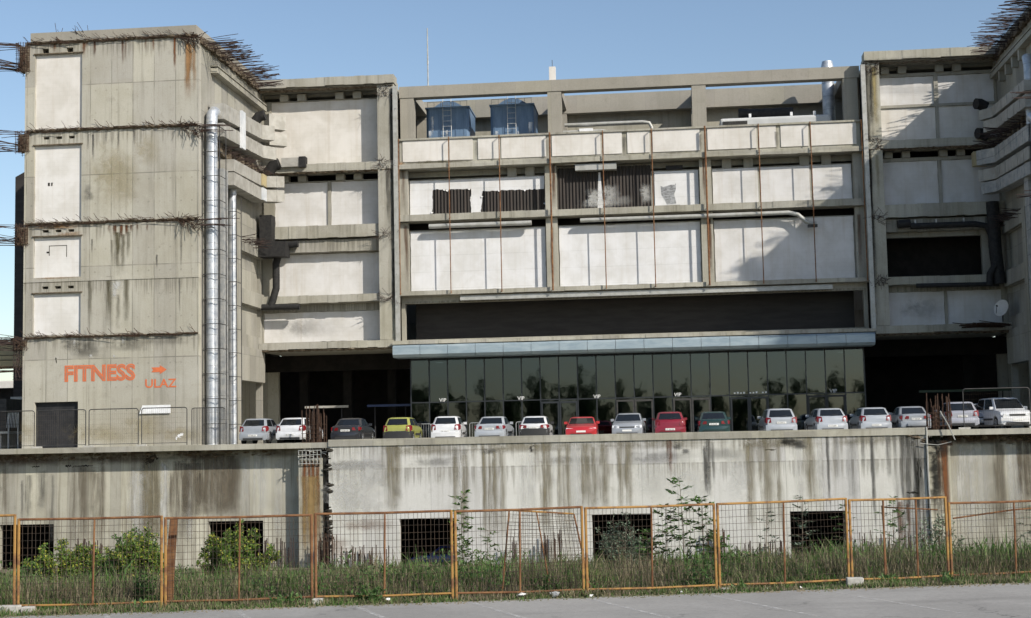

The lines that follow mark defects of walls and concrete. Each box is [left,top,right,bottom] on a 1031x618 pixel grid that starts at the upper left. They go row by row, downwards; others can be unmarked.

corrosion [174,38,195,85]
damp [79,468,103,522]
damp [134,456,236,529]
damp [386,445,396,494]
damp [454,450,467,509]
damp [482,446,503,509]
damp [542,442,607,519]
damp [618,445,630,486]
damp [765,438,780,500]
damp [807,437,830,492]
damp [994,442,1002,511]
damp [1017,440,1031,495]